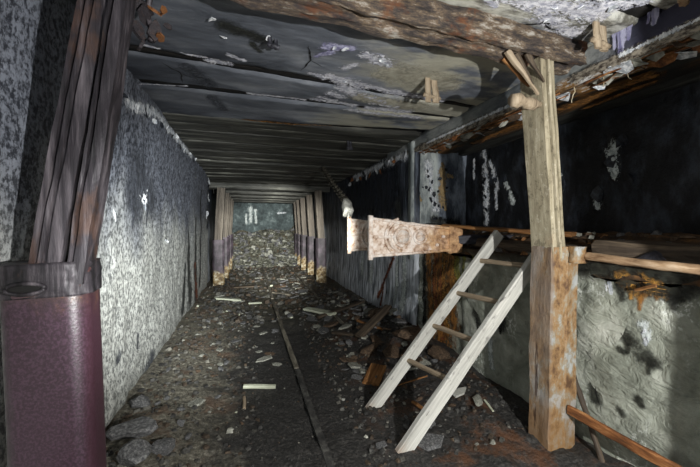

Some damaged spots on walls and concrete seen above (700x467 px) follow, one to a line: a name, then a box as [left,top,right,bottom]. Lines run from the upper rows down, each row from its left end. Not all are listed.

efflorescence [472,150,499,226]
rust [615,272,666,311]
damp [617,324,663,375]
damp [588,383,602,405]